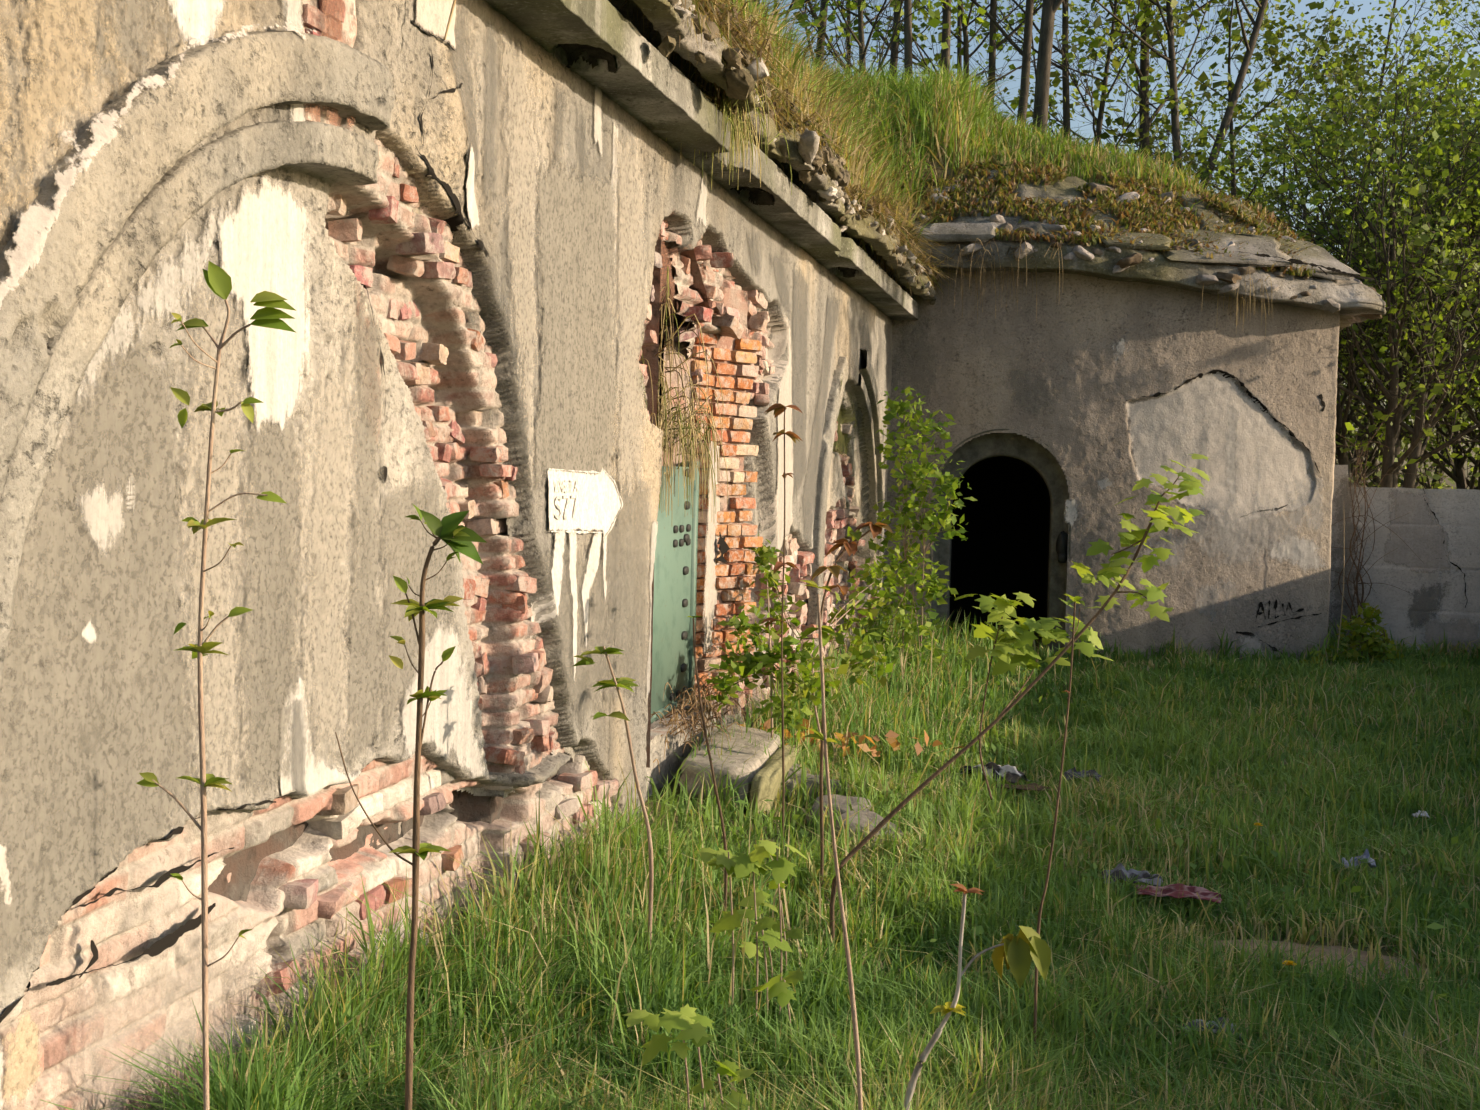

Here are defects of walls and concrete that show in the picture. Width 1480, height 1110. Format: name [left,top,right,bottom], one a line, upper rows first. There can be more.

peeling [301,0,357,48]
spalling [639,220,775,421]
peeling [1126,372,1314,542]
crack [1126,369,1320,473]
spalling [0,137,620,1110]
spalling [739,421,879,727]